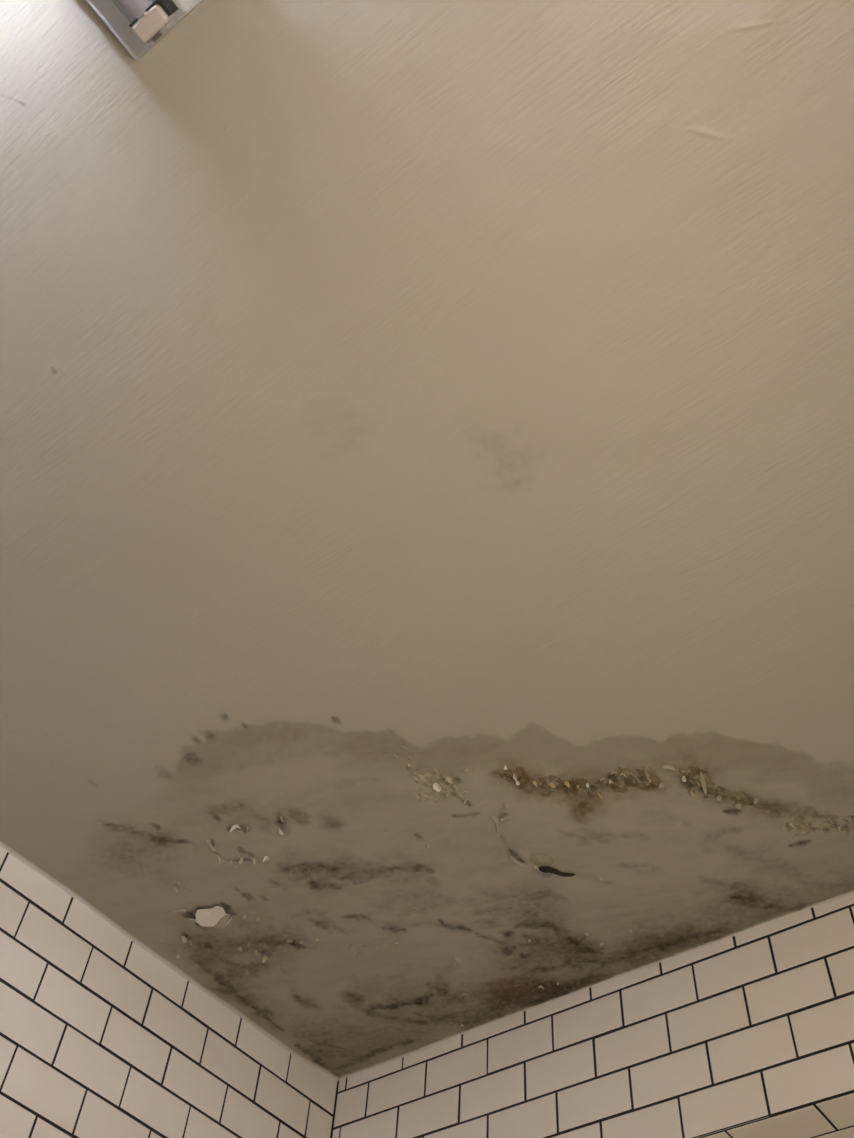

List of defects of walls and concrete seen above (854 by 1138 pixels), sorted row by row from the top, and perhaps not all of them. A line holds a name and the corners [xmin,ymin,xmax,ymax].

peeling [394,739,474,807]
peeling [500,765,771,813]
spalling [175,903,260,959]